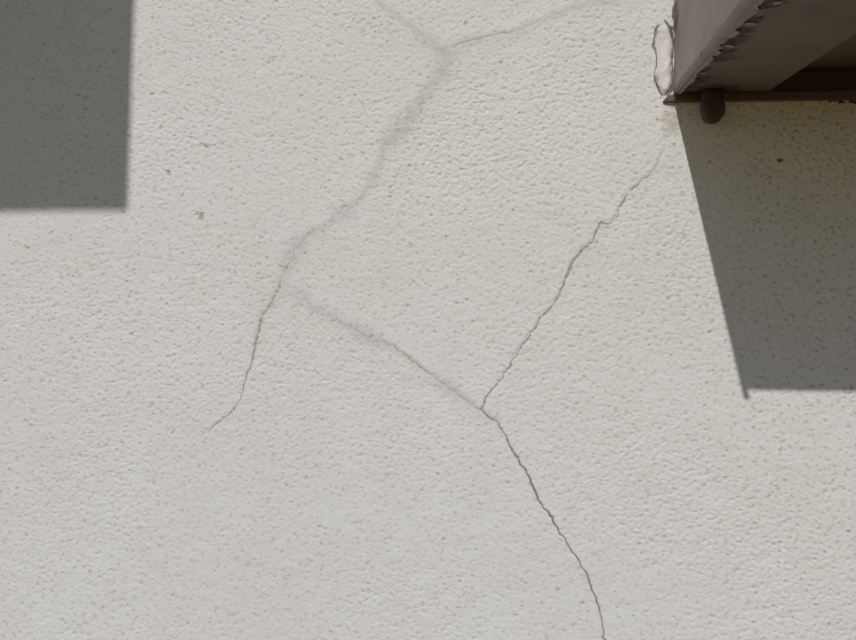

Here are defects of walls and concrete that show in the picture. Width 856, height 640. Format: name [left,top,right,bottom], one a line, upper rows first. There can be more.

crack [460,179,642,640]